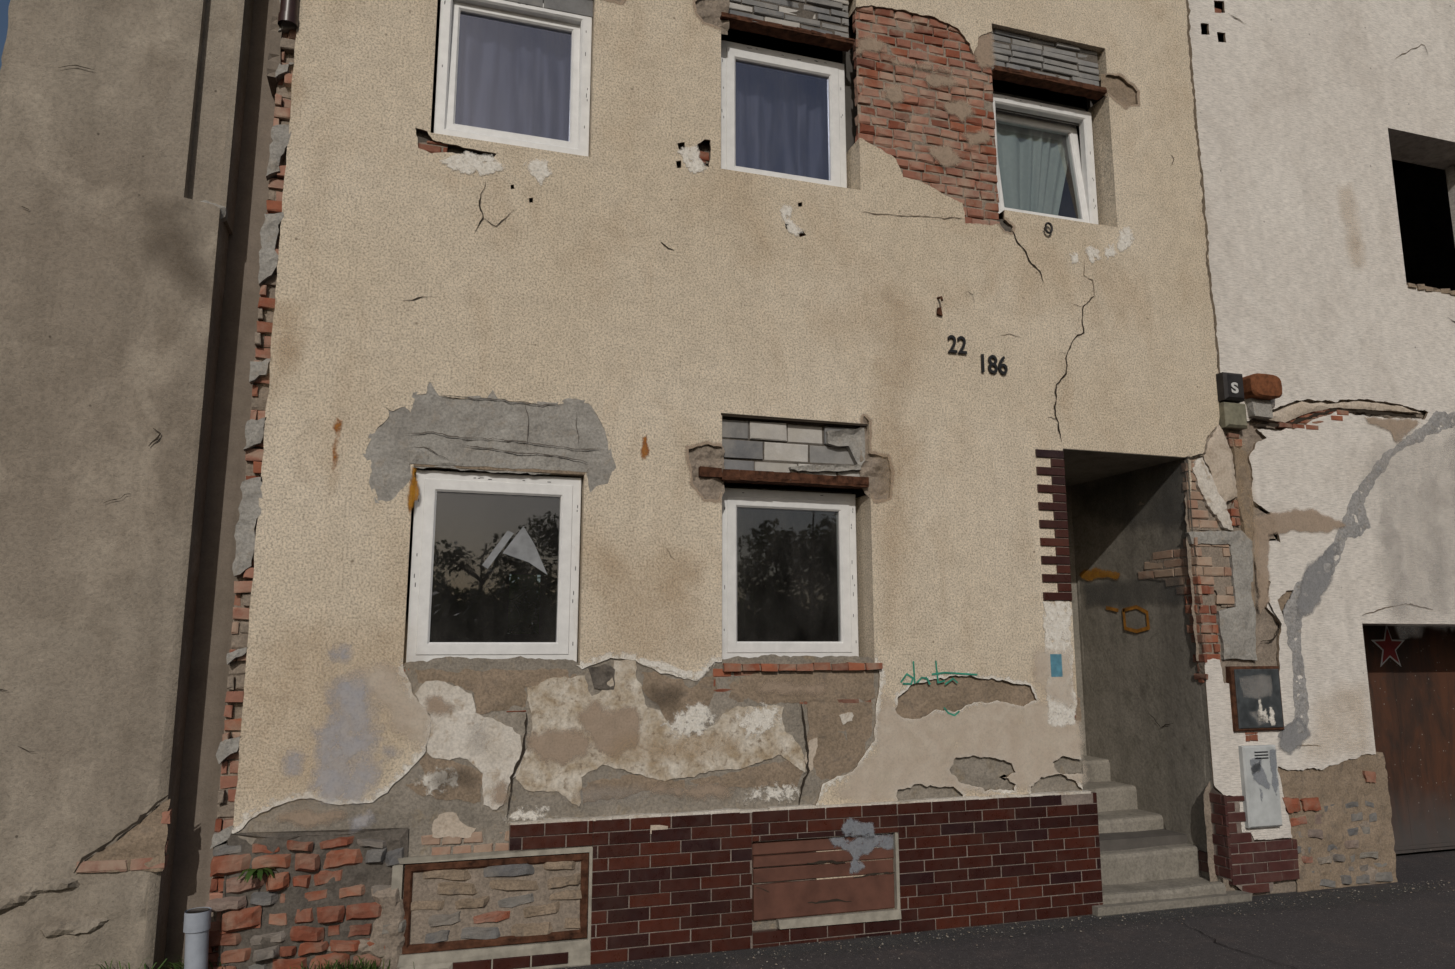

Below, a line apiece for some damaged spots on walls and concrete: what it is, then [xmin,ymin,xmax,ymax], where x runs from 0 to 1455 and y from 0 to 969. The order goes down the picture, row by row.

flaking render [852,1,1015,234]
flaking render [416,129,495,157]
flaking render [676,142,710,168]
crack [1013,232,1043,280]
crack [1048,266,1095,442]
flaking render [1181,421,1293,683]
flaking render [232,651,1038,898]
flaking render [896,754,1083,801]
flaking render [752,919,777,930]